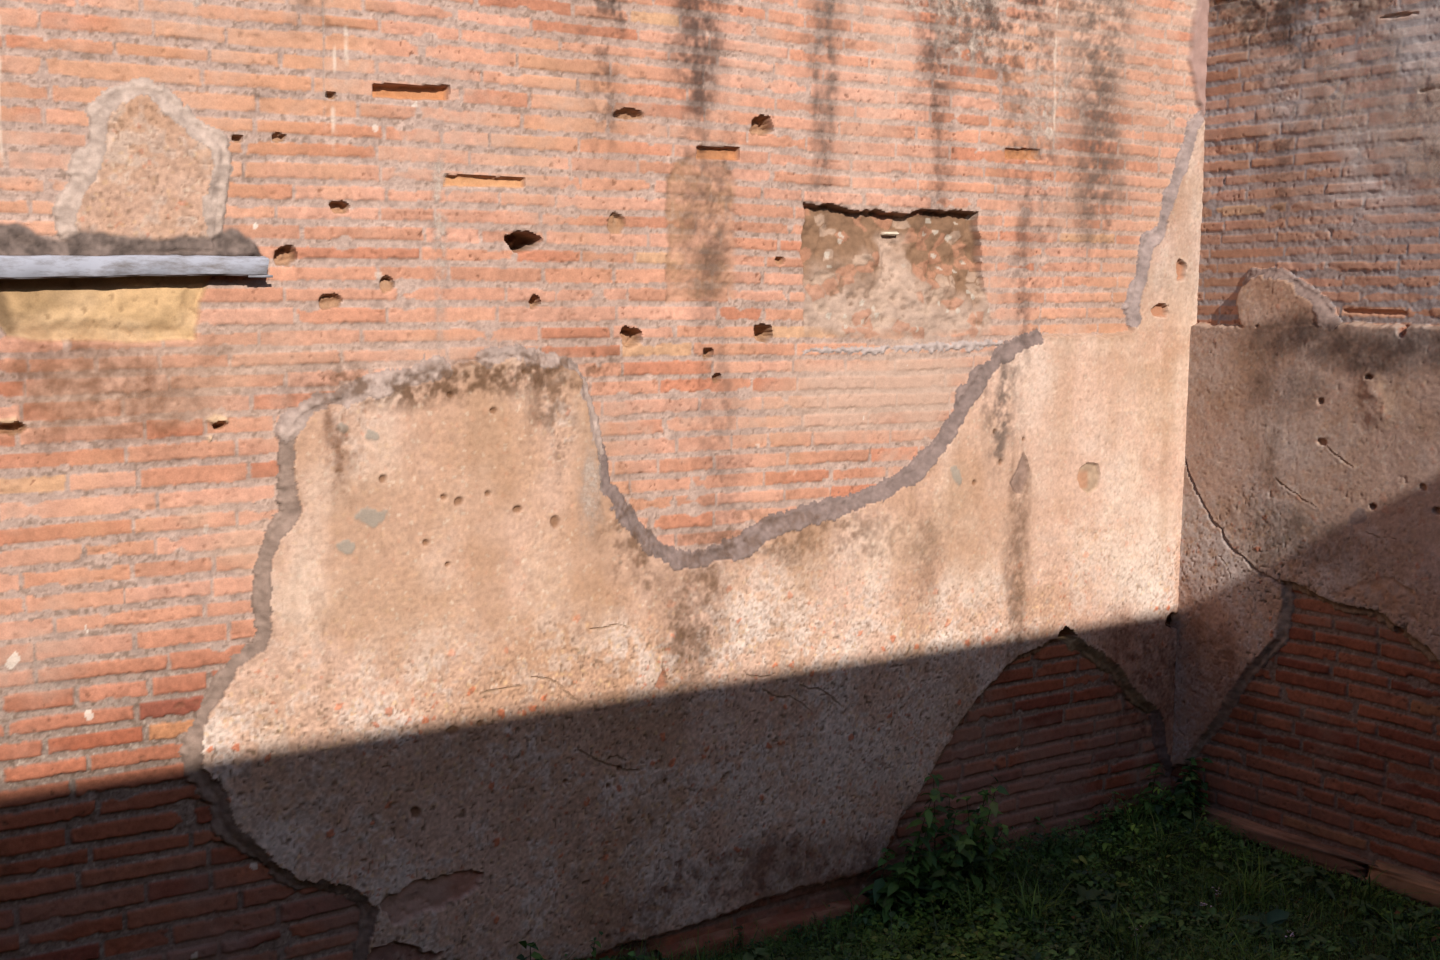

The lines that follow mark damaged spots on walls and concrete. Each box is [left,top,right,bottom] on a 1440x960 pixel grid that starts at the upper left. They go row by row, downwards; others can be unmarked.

spalling [372,82,451,100]
leakage [680,0,717,114]
leakage [910,0,1038,106]
spalling [443,173,526,188]
spalling [665,145,740,303]
spalling [0,275,211,343]
spalling [800,202,993,345]
flaking render [1151,303,1170,317]
leakage [1284,318,1440,370]
flaking render [1077,461,1101,494]
flaking render [876,638,1172,882]
flaking render [366,868,484,960]